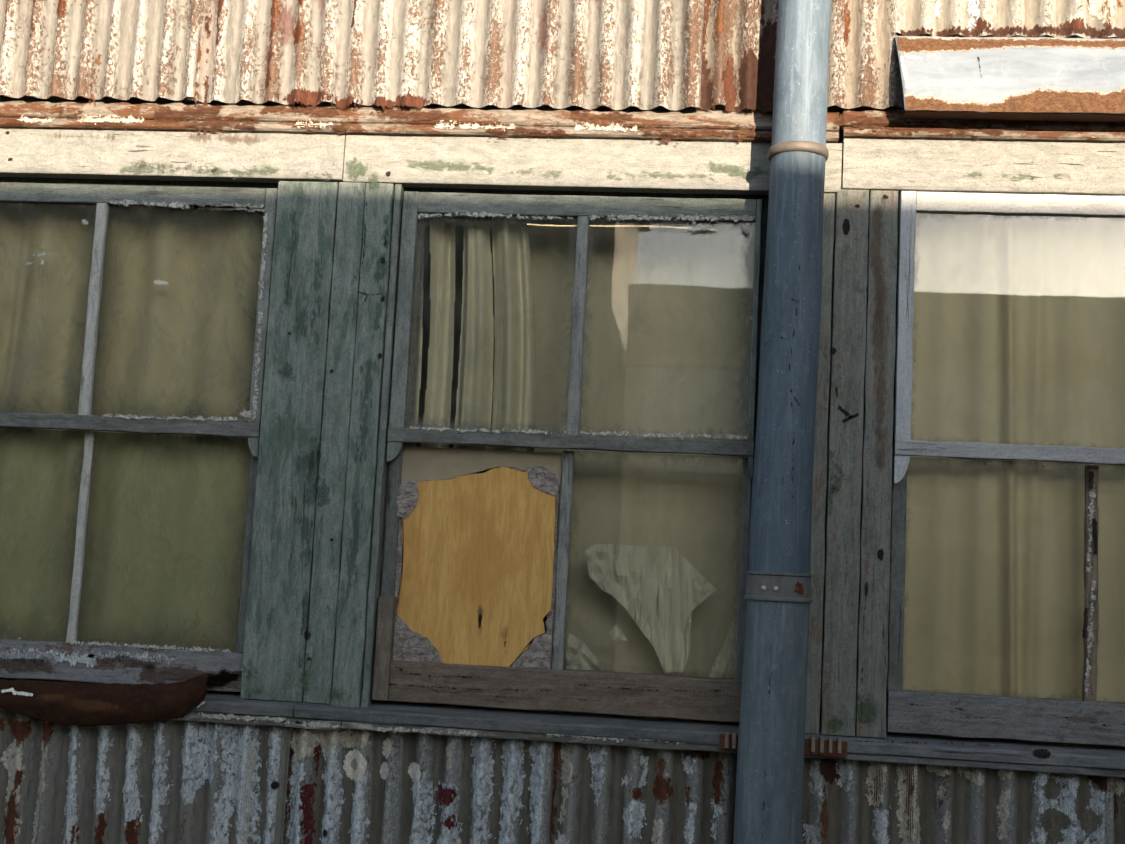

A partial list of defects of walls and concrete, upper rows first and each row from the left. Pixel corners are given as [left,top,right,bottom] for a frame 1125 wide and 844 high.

corrosion [56,0,67,19]
corrosion [153,0,453,136]
corrosion [485,0,777,144]
corrosion [896,0,1125,55]
peeling [589,214,755,234]
peeling [0,640,231,667]
corrosion [0,668,242,750]
peeling [0,739,49,844]
corrosion [286,743,324,844]
peeling [61,701,696,844]
peeling [683,797,724,844]
peeling [1029,772,1125,844]